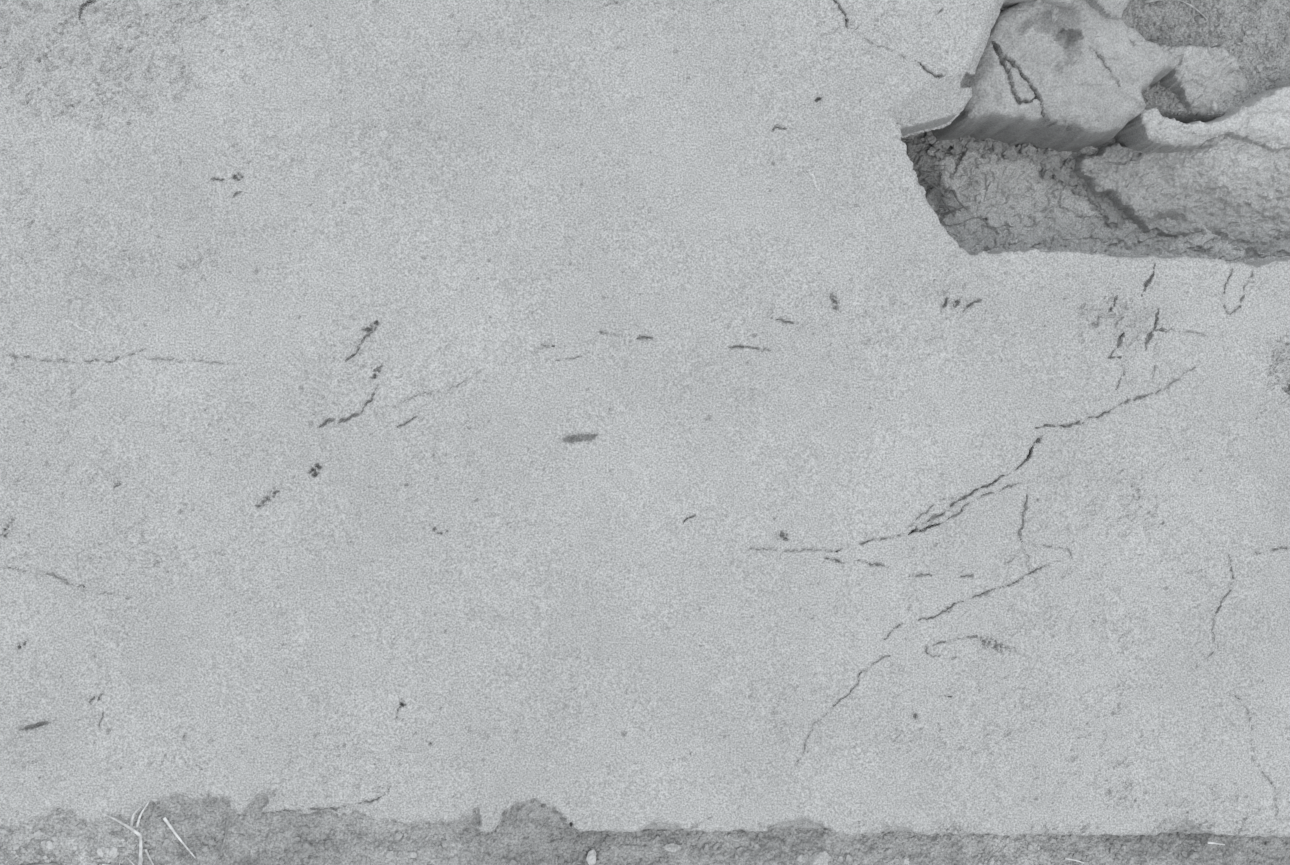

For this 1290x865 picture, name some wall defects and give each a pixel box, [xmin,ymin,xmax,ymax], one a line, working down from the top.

peeling [889,0,1005,133]
peeling [916,177,933,214]
crack [749,267,1255,767]
peeling [91,791,242,827]
peeling [384,796,580,832]
peeling [1154,813,1218,836]